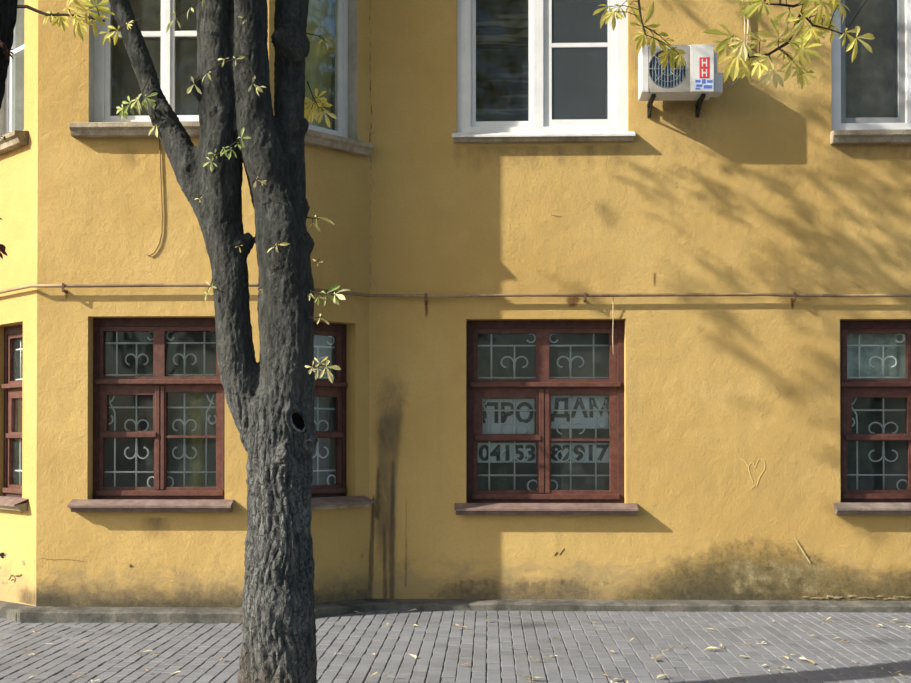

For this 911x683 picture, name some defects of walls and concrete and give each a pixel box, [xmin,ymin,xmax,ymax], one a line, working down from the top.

water stain [314,417,399,603]
water stain [449,585,588,600]
water stain [624,553,911,601]